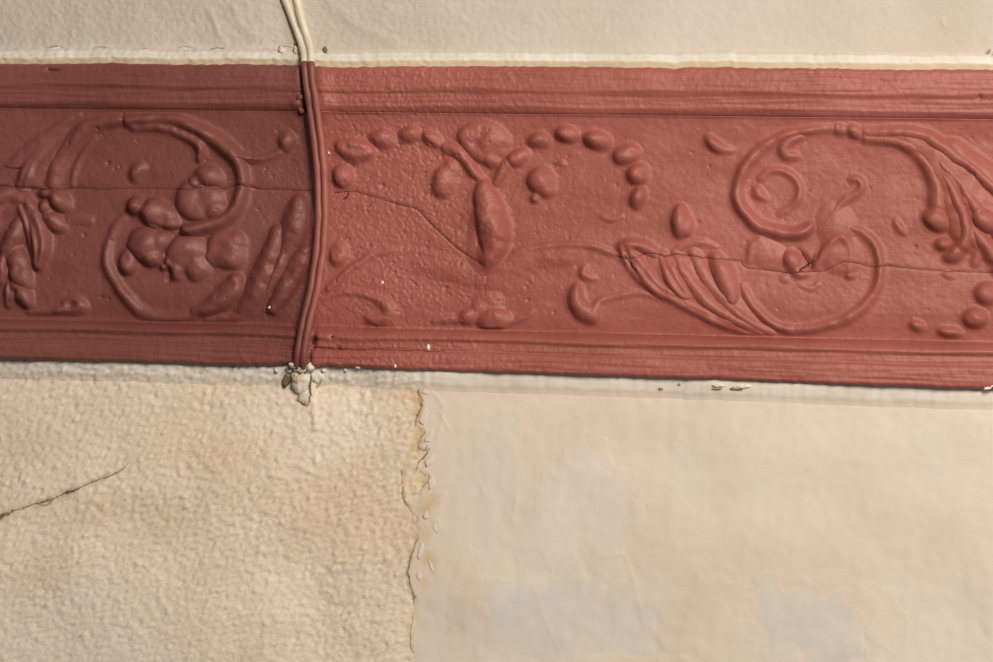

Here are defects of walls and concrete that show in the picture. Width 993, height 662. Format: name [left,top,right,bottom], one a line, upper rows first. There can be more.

crack [0,165,310,191]
crack [336,191,480,264]
crack [617,251,992,274]
peeling [415,388,436,490]
crack [0,463,129,524]
peeling [407,510,438,653]